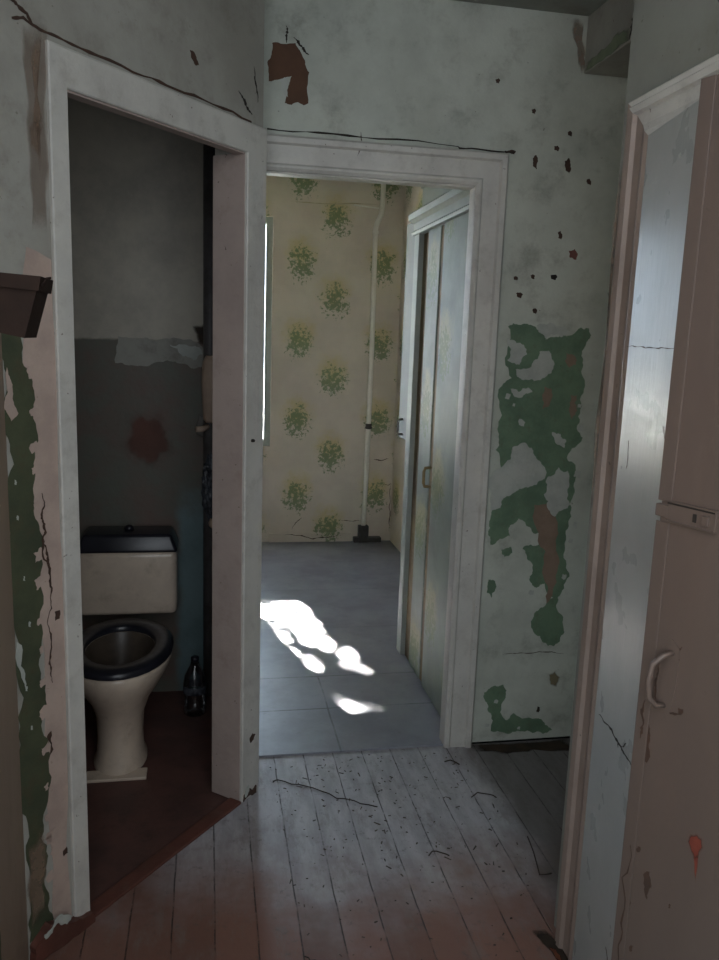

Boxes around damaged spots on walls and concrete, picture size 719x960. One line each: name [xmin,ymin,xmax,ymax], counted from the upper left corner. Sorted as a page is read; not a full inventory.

crack [11,0,514,156]
peeling [281,77,289,97]
peeling [23,247,52,280]
peeling [487,308,591,646]
peeling [1,293,96,960]
peeling [483,685,552,734]
crack [599,700,645,764]